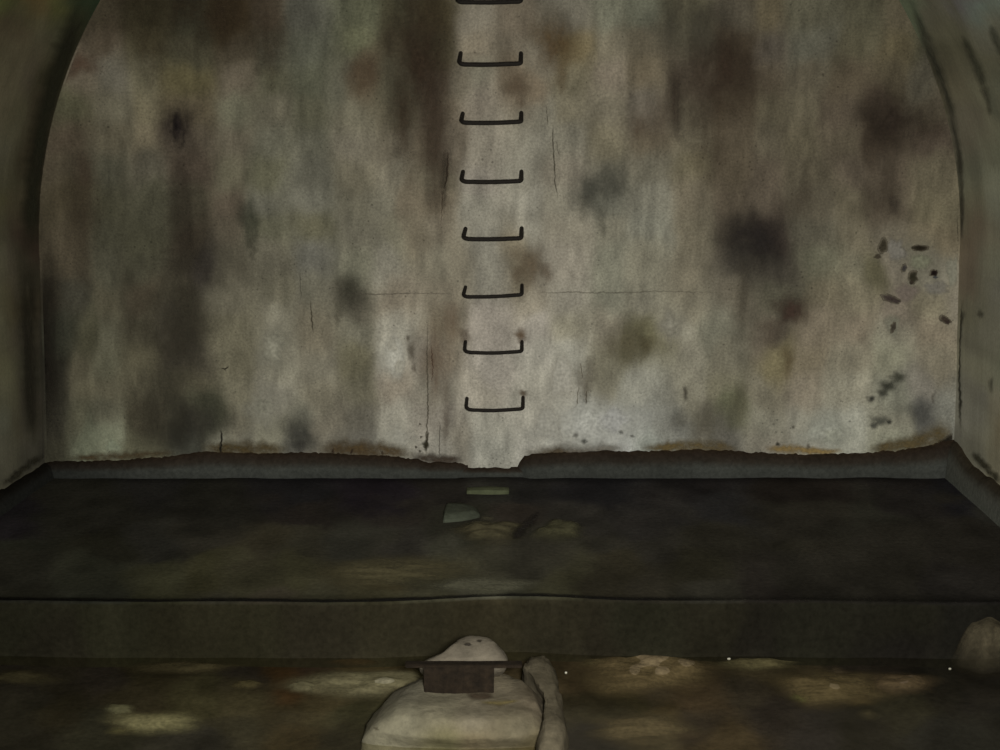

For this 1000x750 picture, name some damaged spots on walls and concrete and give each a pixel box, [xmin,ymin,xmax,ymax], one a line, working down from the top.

spalling [874,237,888,259]
spalling [911,244,930,252]
spalling [900,263,938,285]
spalling [879,293,901,304]
crack [415,350,440,452]
rust [651,442,726,451]
rust [773,446,836,454]
rust [878,428,948,451]